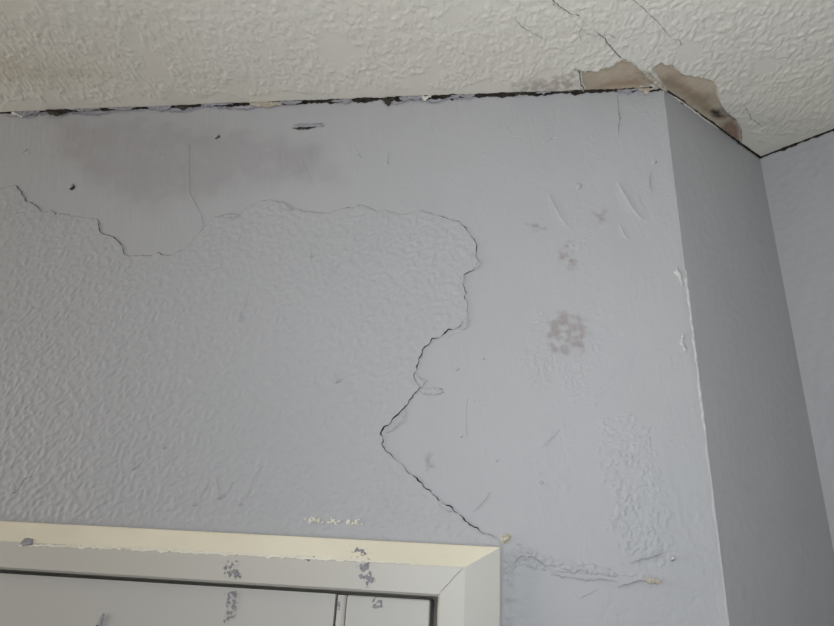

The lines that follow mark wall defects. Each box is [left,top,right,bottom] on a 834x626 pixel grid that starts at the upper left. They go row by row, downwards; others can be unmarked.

crack [551,0,636,67]
crack [632,0,682,46]
crack [0,87,834,159]
peeling [575,60,743,143]
peeling [96,219,194,257]
peeling [378,210,497,539]